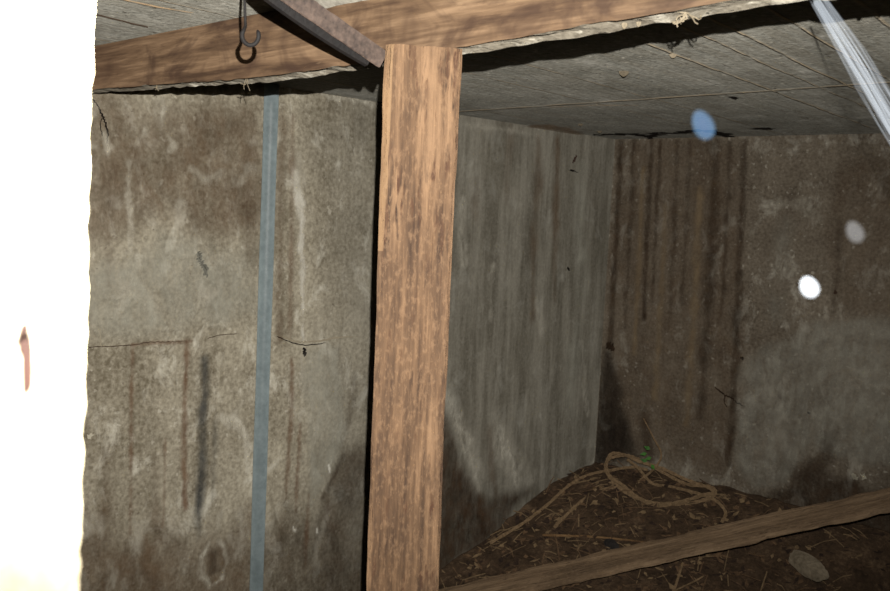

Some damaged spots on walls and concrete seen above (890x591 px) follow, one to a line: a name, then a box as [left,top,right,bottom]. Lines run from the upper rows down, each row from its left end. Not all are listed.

crack [593,129,734,139]
crack [85,329,182,348]
damp [596,356,631,463]
damp [197,449,205,513]